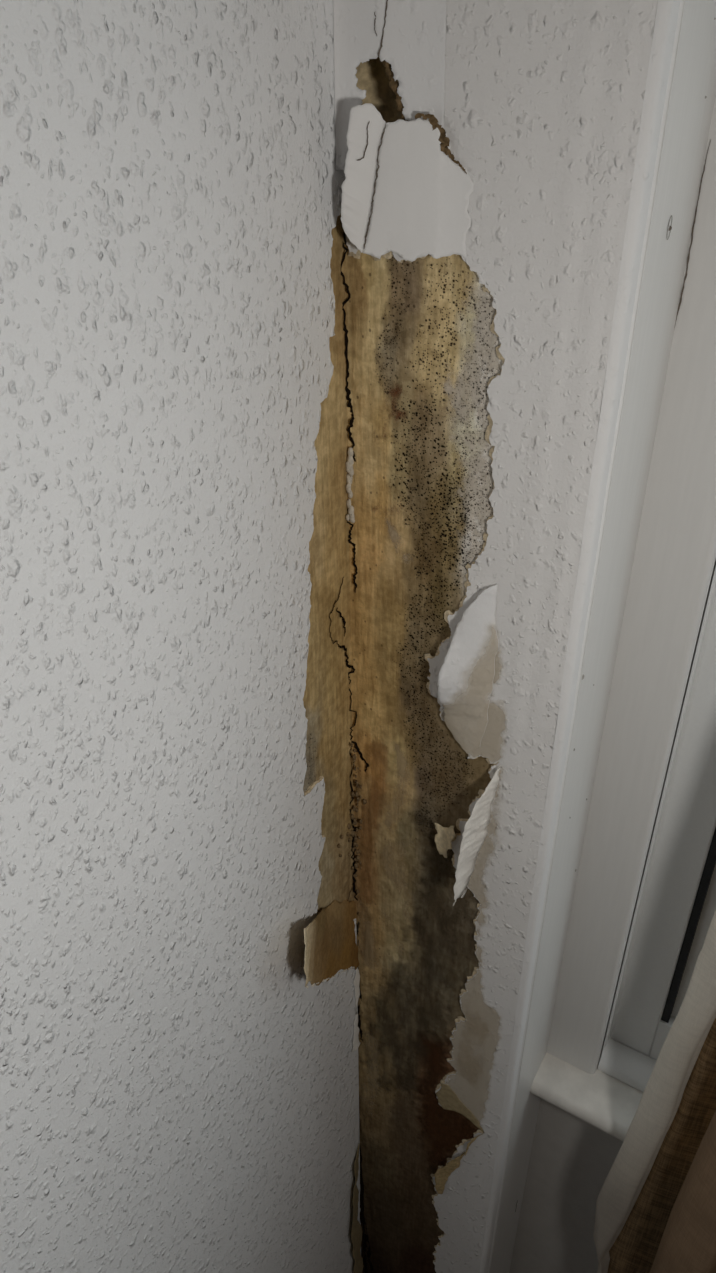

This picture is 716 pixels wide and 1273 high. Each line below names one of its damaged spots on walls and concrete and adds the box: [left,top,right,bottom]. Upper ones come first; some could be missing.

crack [374,0,388,57]
flaking render [356,57,408,131]
crack [341,121,386,462]
water stain [375,257,505,875]
crack [329,509,369,1041]
water stain [368,820,499,1123]
crack [360,1149,373,1273]